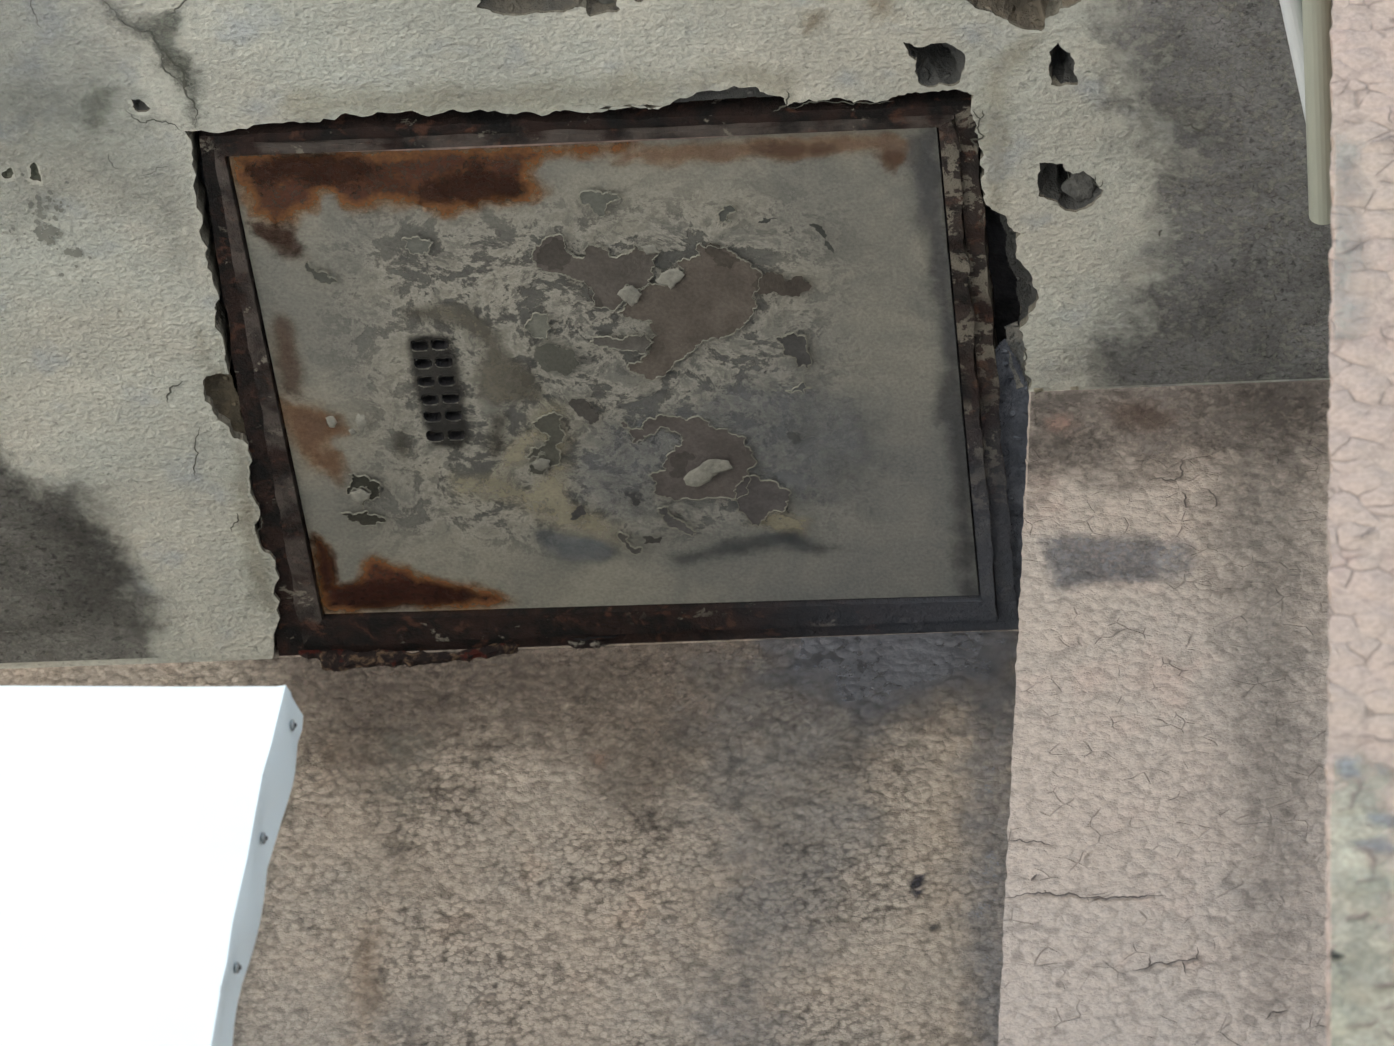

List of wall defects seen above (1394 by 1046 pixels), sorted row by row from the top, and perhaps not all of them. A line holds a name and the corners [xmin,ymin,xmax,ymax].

spalling [477,0,619,15]
spalling [904,42,965,86]
corrosion [230,135,904,257]
spalling [1037,163,1102,210]
peeling [524,233,812,381]
peeling [525,398,599,476]
peeling [341,472,387,526]
peeling [616,414,792,555]
water stain [0,468,149,663]
corrosion [311,536,509,614]
water stain [1048,537,1189,584]
crack [1134,948,1199,974]